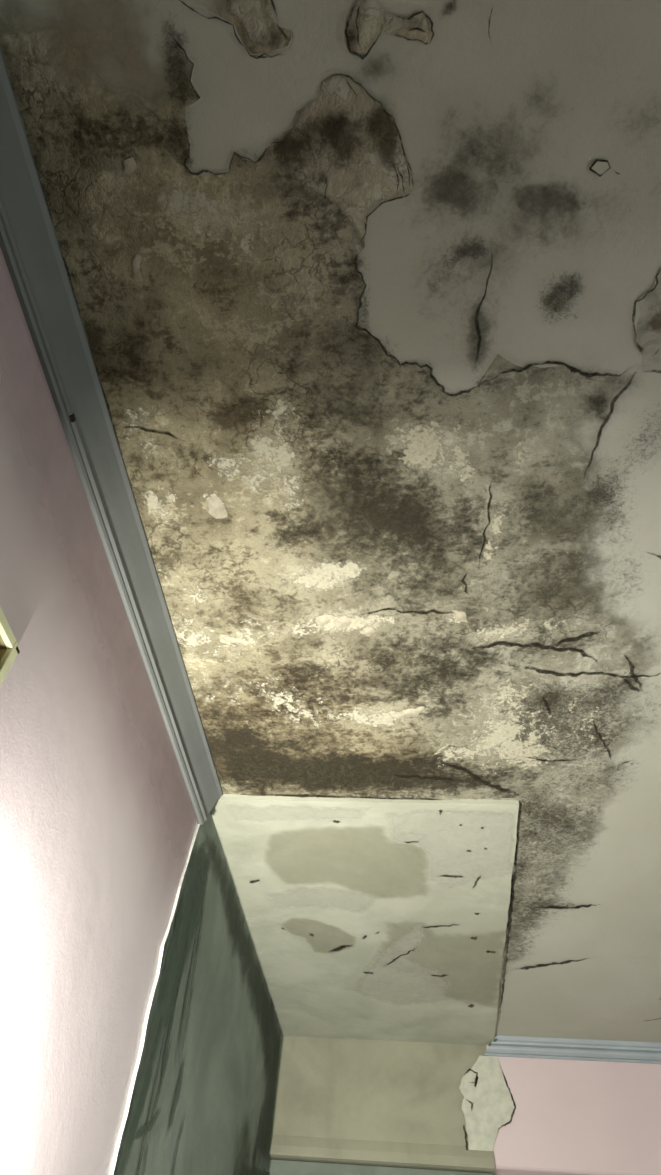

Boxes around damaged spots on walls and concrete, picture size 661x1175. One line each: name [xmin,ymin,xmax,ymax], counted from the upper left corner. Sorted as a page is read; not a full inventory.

water stain [540,275,582,317]
peeling [632,268,661,356]
water stain [589,396,607,420]
peeling [0,0,651,939]
water stain [531,475,621,536]
water stain [0,248,281,1175]
crack [474,632,661,714]
water stain [502,678,634,770]
crack [593,721,629,764]
water stain [215,715,582,952]
peeling [110,812,492,1175]
peeling [459,1055,516,1151]